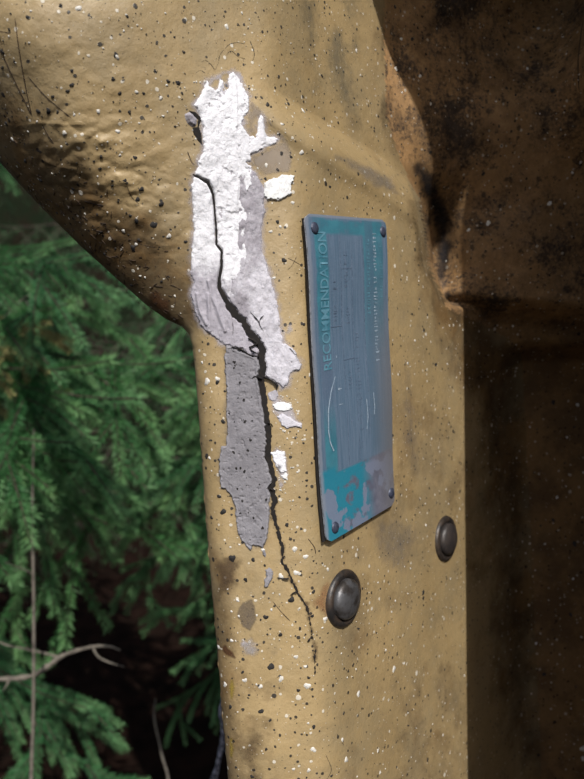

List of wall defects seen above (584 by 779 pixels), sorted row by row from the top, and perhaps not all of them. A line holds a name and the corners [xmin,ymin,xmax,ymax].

spalling [190,72,302,429]
crack [193,174,317,684]
peeling [271,450,288,480]
water stain [414,163,451,278]